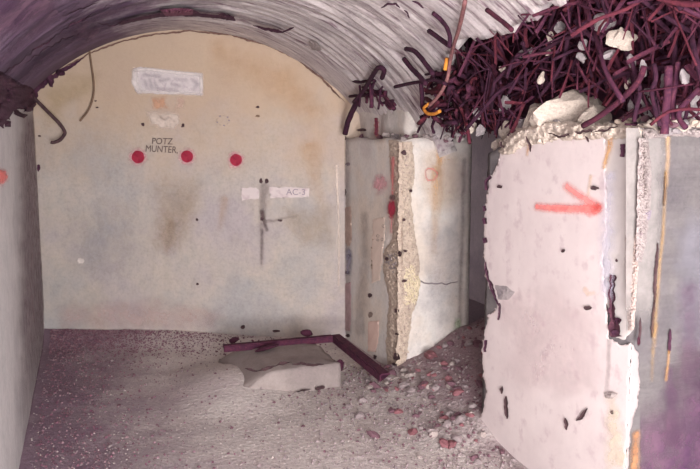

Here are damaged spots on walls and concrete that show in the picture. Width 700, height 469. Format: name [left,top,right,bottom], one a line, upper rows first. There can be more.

spalling [0,71,36,128]
peeling [342,0,700,469]
crack [418,280,455,296]